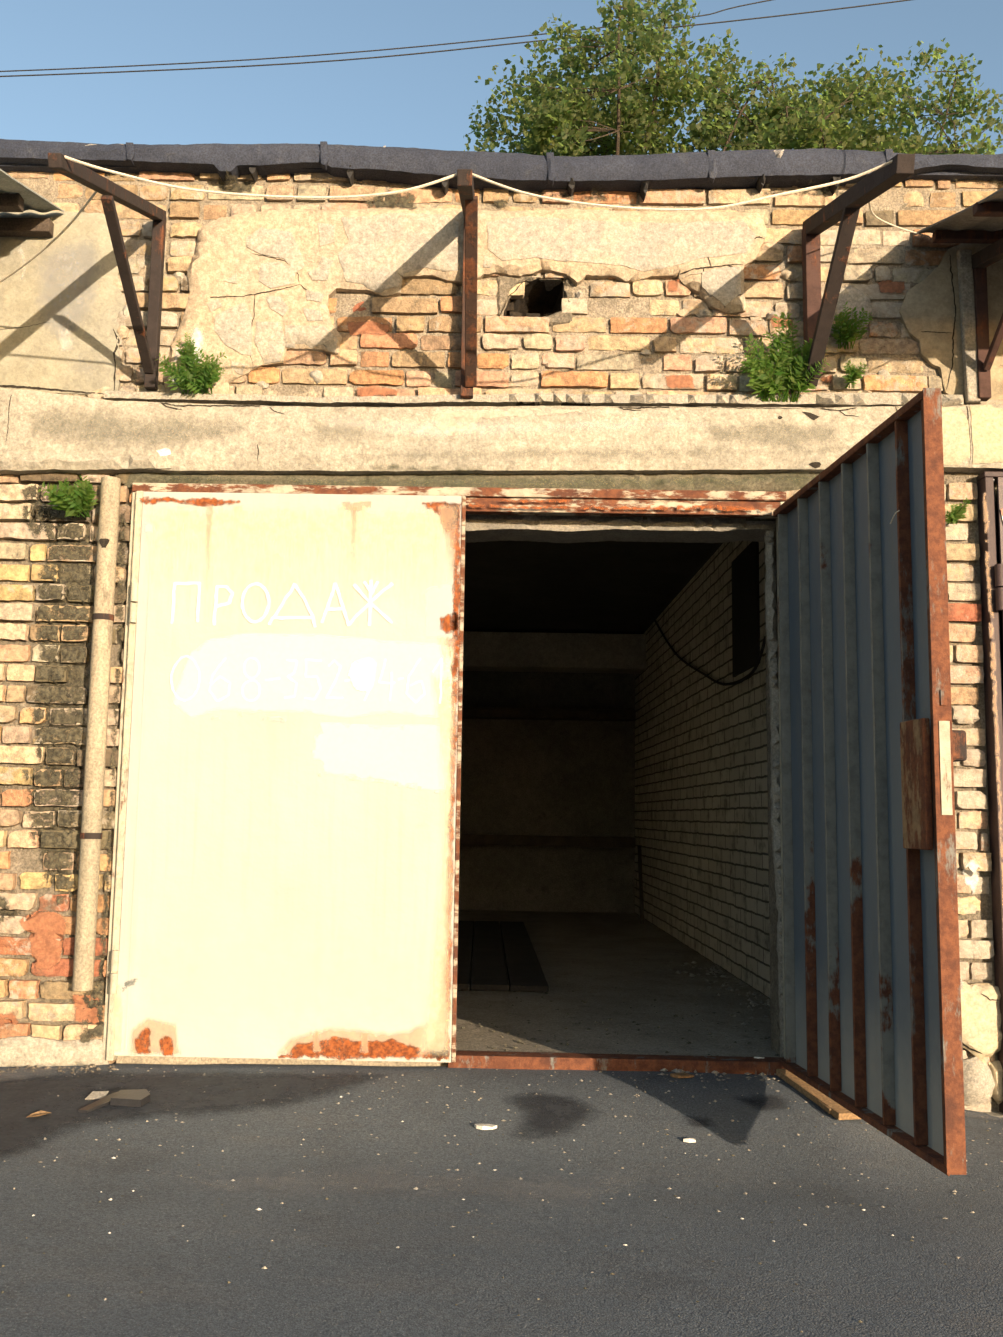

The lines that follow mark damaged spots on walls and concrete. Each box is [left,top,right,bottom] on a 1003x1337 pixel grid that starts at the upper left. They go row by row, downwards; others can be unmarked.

spalling [58,221,202,400]
crack [210,253,307,324]
spalling [230,212,1003,465]
rust [278,499,765,1061]